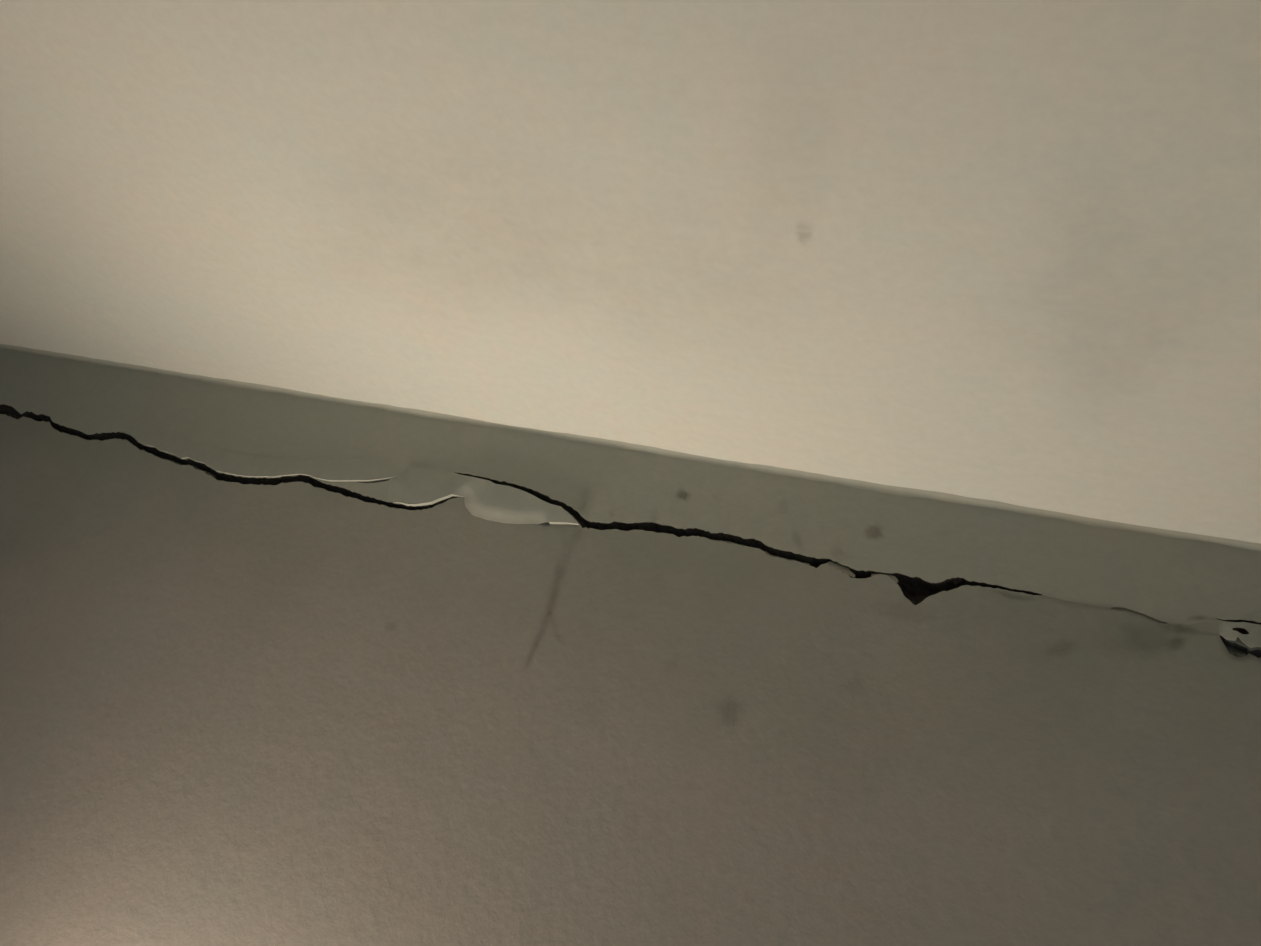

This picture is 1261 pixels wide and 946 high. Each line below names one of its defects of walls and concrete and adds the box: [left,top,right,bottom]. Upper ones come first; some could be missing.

crack [0,404,898,583]
crack [942,577,1042,595]
crack [1111,607,1167,624]
crack [1218,618,1261,626]
flaking render [1218,622,1261,658]